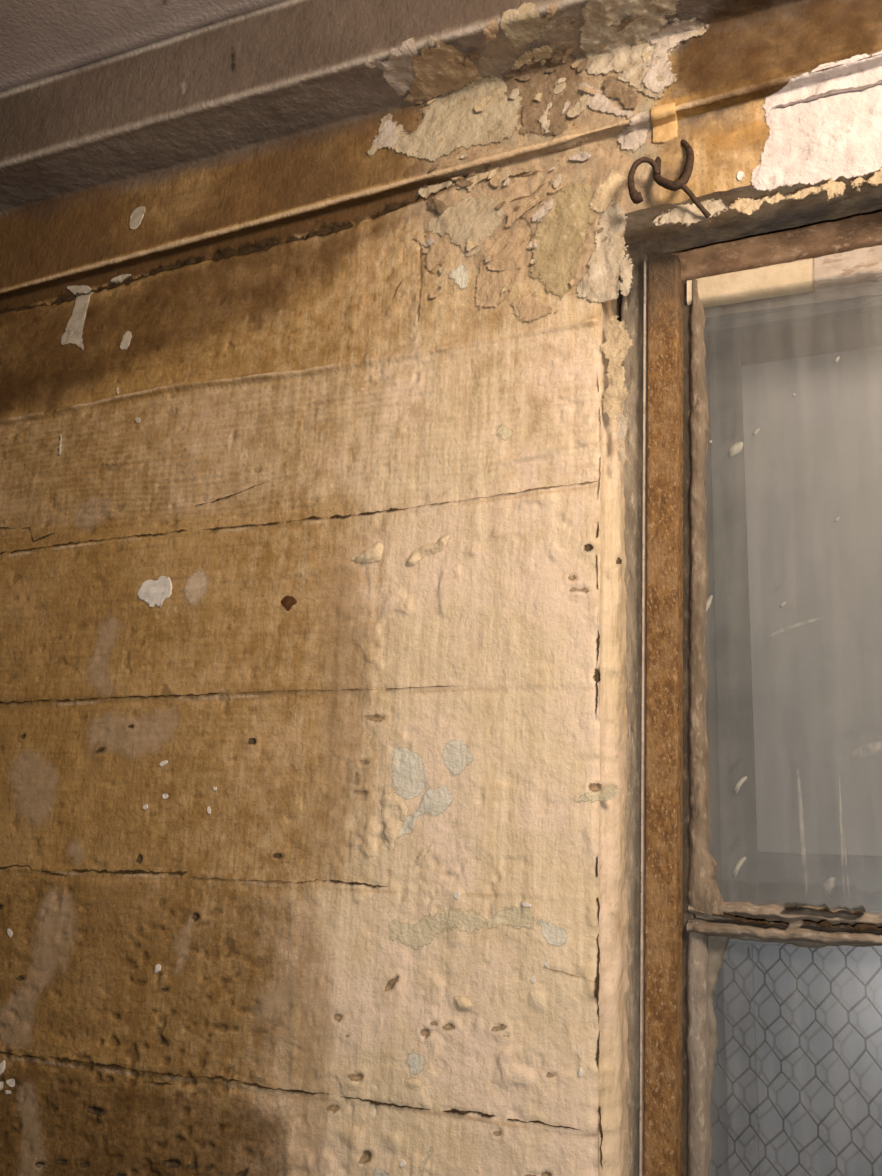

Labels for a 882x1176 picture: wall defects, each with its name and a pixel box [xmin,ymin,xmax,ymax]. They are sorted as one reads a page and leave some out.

peeling [365,0,709,171]
peeling [653,51,882,226]
damp [627,230,681,261]
peeling [60,285,93,350]
damp [0,248,302,413]
crack [0,376,601,589]
peeling [137,576,172,607]
damp [184,570,208,604]
crack [593,630,601,717]
damp [90,712,176,757]
crack [545,856,600,1066]
crack [0,1051,603,1170]